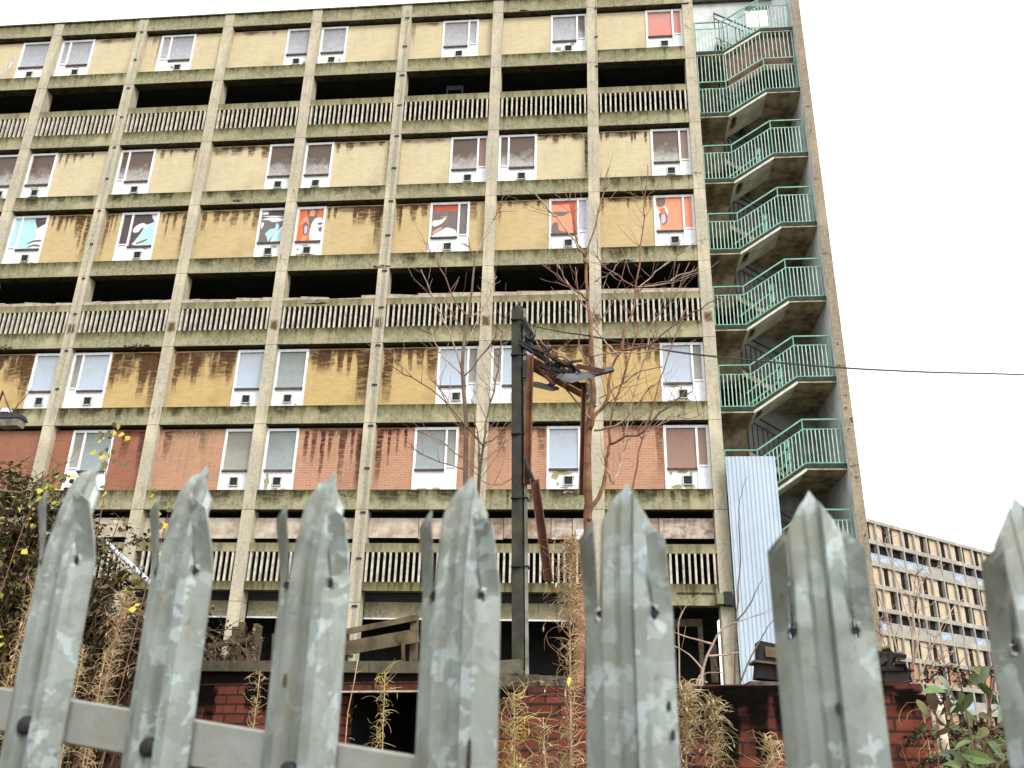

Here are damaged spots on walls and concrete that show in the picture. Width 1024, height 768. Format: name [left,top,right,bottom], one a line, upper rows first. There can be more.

water stain [52,215,91,244]
water stain [202,210,260,224]
water stain [328,206,384,235]
water stain [109,353,161,397]
water stain [172,351,237,384]
water stain [310,349,370,396]
water stain [304,429,363,469]